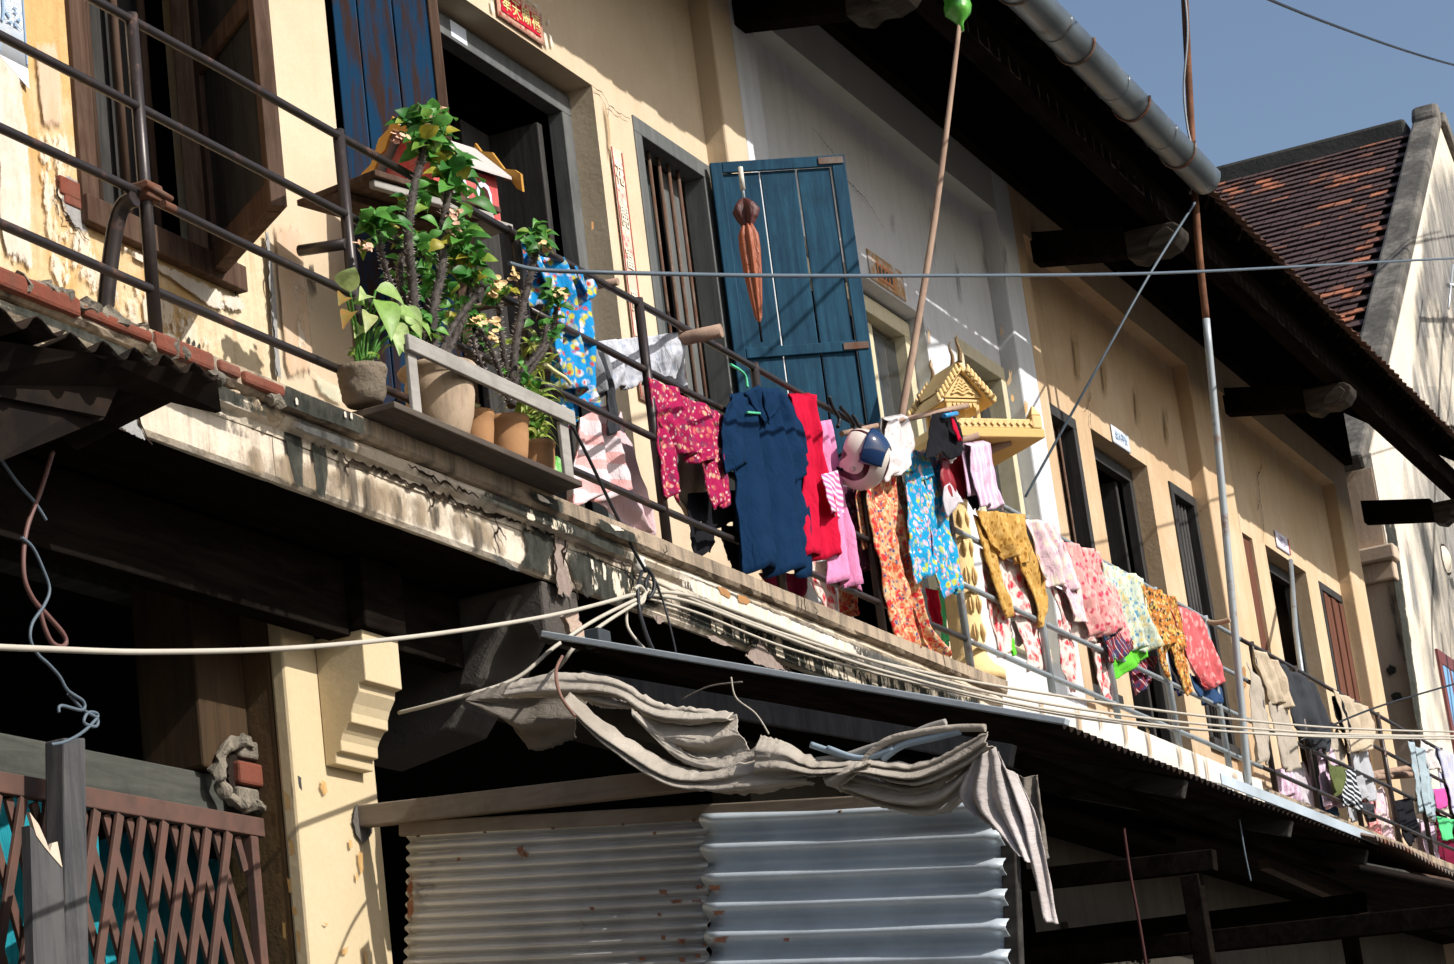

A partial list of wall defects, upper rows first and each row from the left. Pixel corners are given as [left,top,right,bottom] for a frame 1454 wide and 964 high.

peeling [0,44,342,423]
water stain [1413,173,1454,422]
crack [324,445,555,553]
peeling [483,492,637,600]
water stain [249,386,980,704]
water stain [1411,472,1450,503]